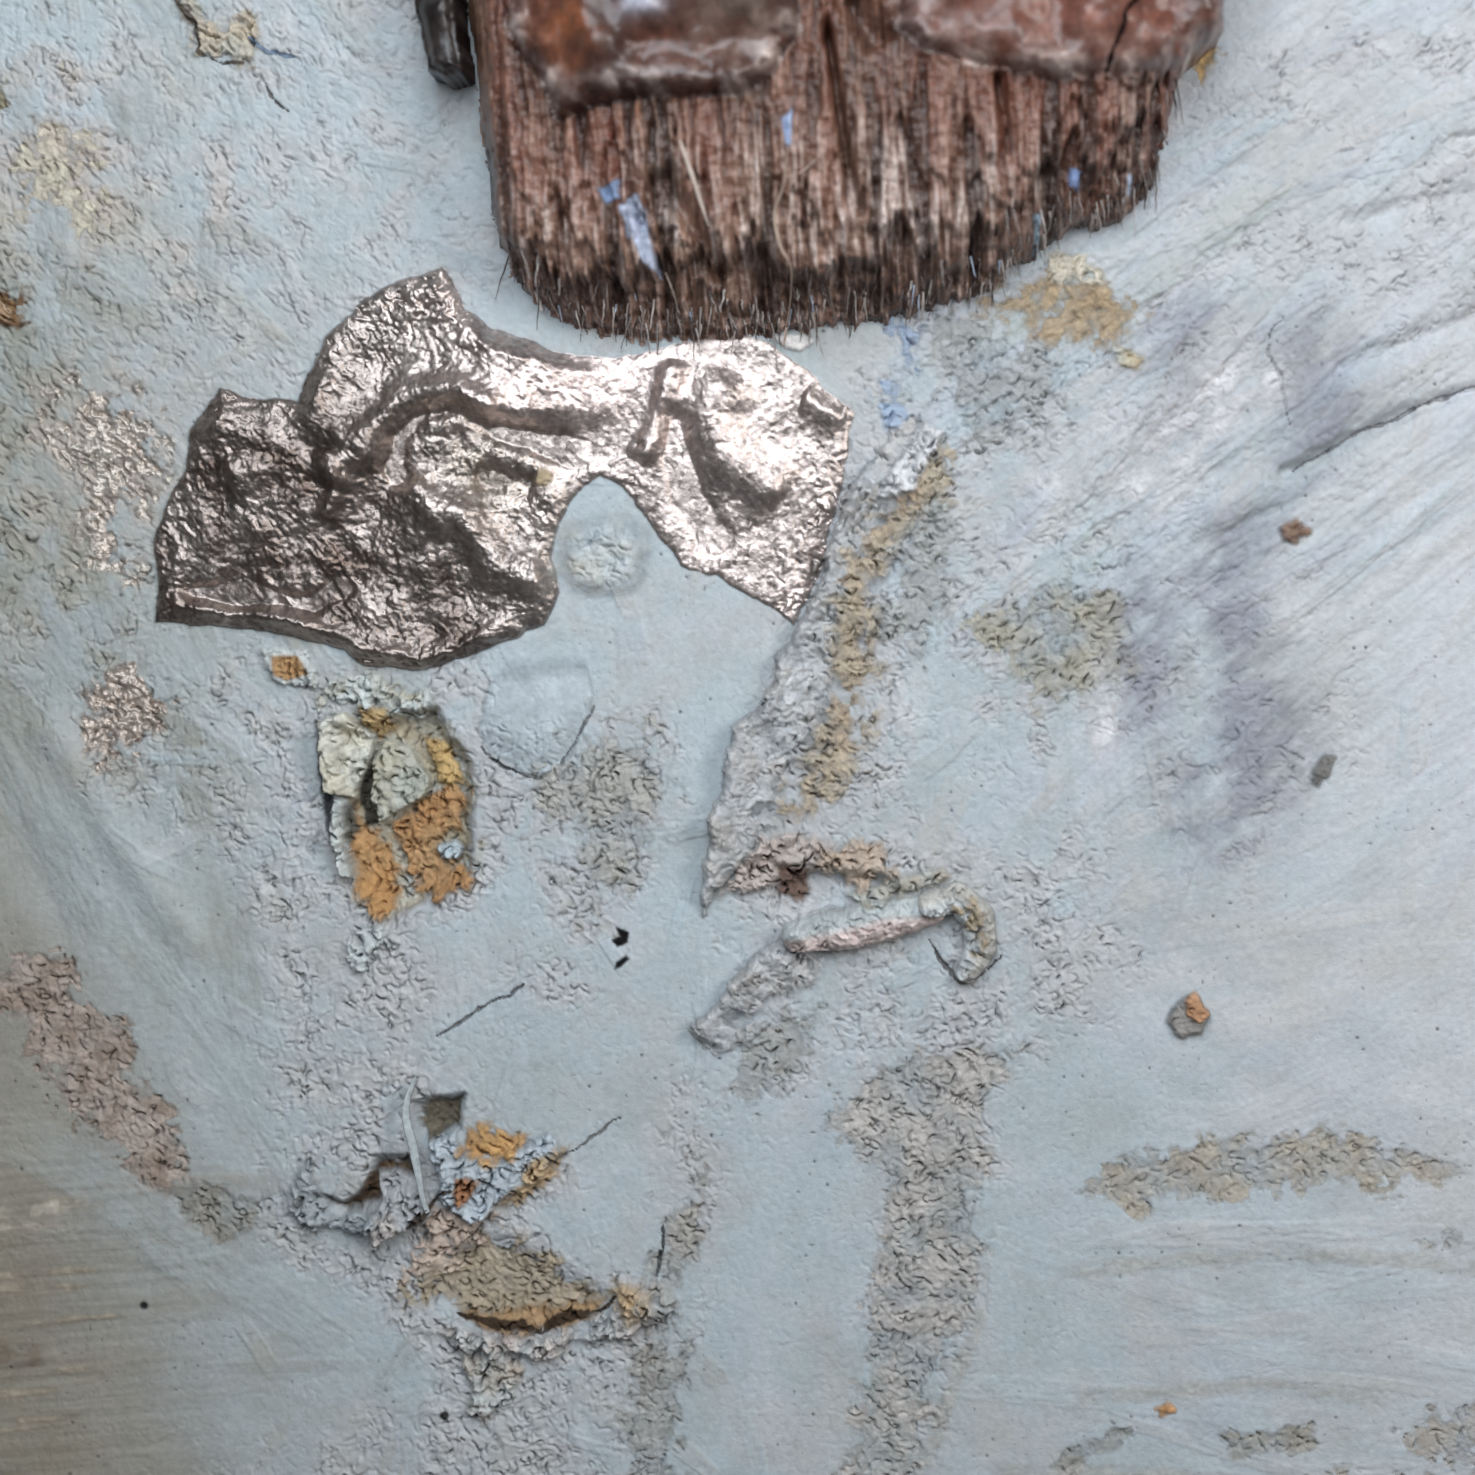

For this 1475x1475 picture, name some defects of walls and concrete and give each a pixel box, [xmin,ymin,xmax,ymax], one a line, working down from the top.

spalling [0,291,27,329]
spalling [261,647,485,972]
peeling [718,832,997,985]
peeling [0,947,258,1243]
peeling [288,1162,497,1285]
peeling [825,1043,1028,1475]
peeling [1085,1127,1461,1220]
peeling [1220,1423,1316,1458]
peeling [1403,1404,1475,1475]